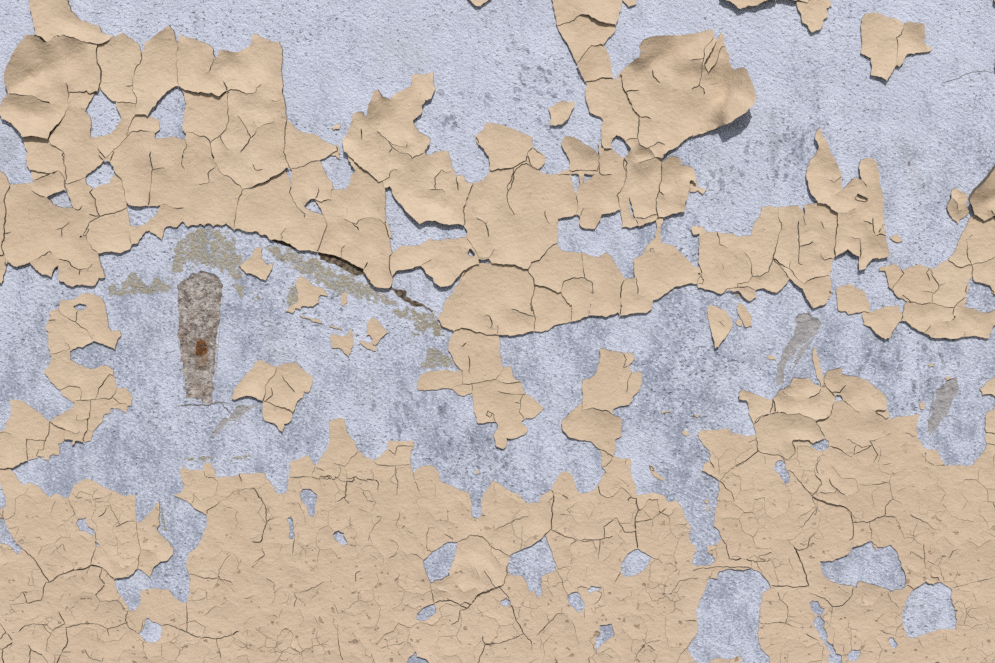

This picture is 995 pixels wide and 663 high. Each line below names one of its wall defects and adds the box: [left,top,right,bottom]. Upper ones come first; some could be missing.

peeling [0,0,141,286]
rust [194,339,208,368]
crack [272,239,364,276]
crack [389,286,433,312]
peeling [69,0,757,292]
peeling [691,127,889,308]
crack [0,553,109,663]
peeling [186,451,556,663]
peeling [479,428,913,663]
crack [773,543,809,588]
crack [737,440,893,540]
peeling [813,368,995,663]